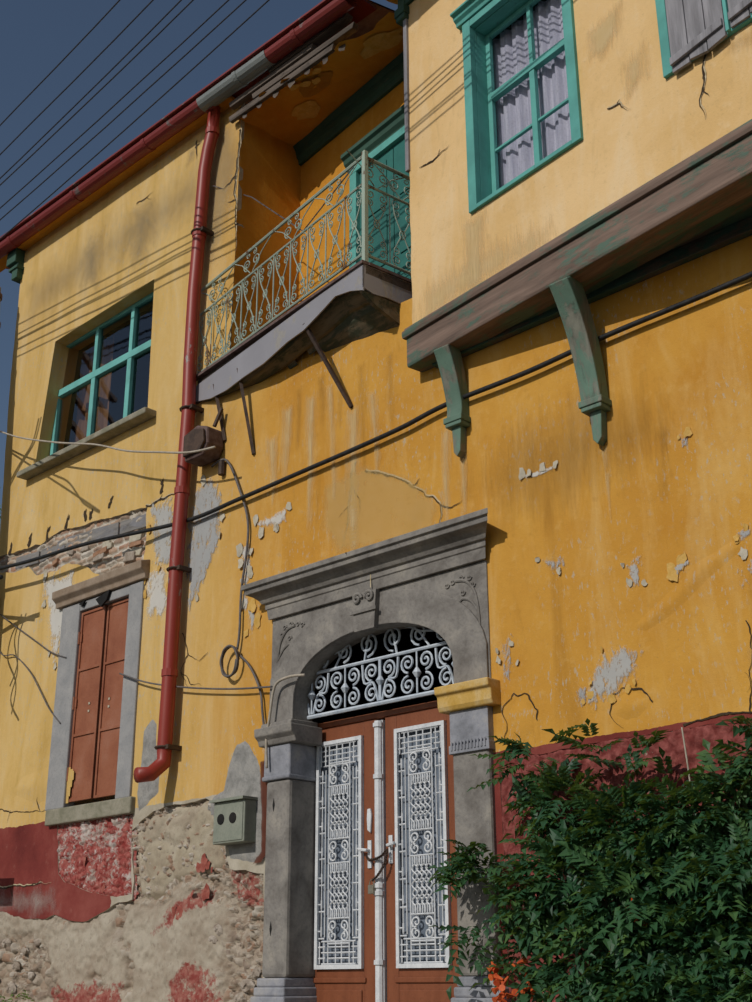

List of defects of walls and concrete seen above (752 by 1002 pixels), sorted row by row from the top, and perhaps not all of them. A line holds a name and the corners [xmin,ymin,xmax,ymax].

crack [699,54,709,114]
crack [222,128,245,249]
flaking render [0,497,174,670]
peeling [186,475,225,611]
crack [344,461,460,555]
peeling [519,460,558,480]
peeling [733,523,752,573]
peeling [576,647,637,709]
crack [683,620,752,727]
flaking render [499,720,752,912]
flaking render [0,799,264,1002]
flaking render [504,926,590,1001]